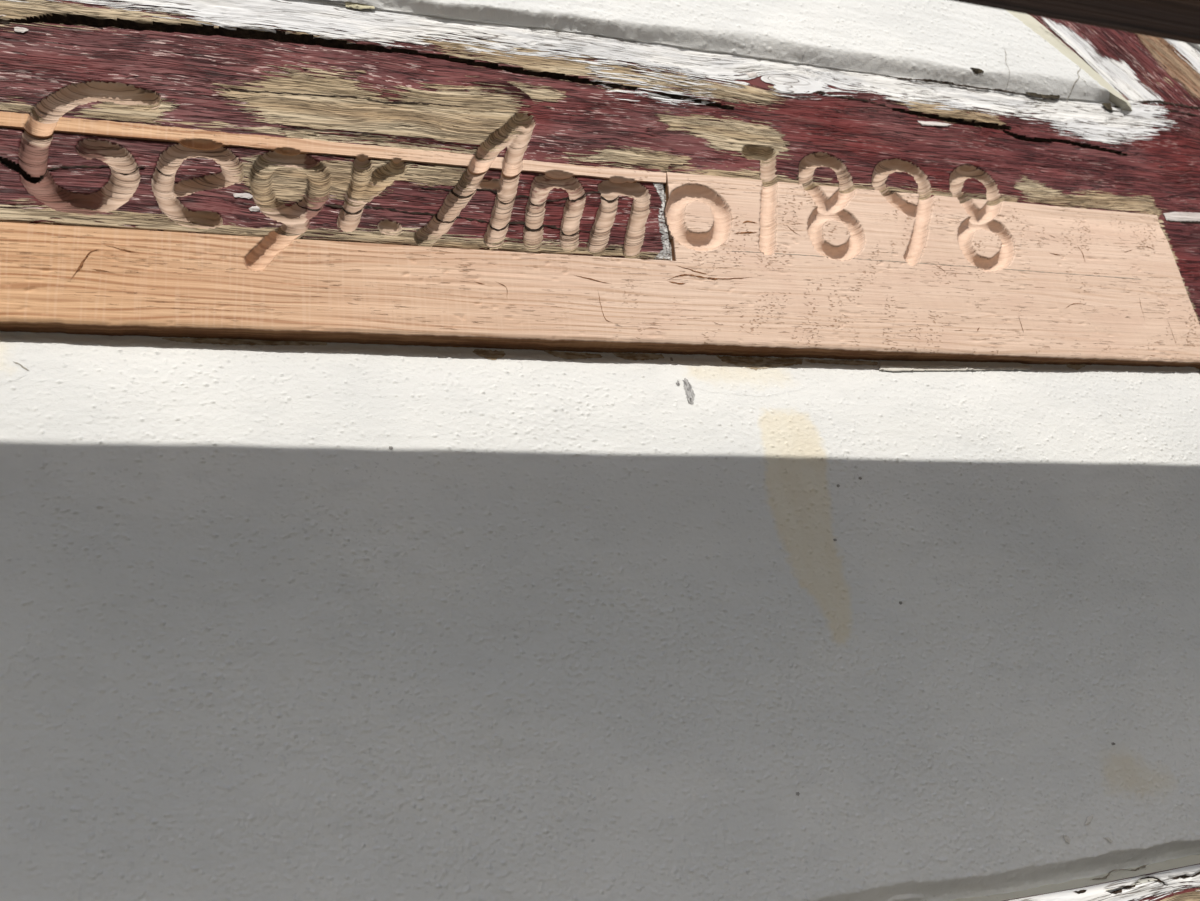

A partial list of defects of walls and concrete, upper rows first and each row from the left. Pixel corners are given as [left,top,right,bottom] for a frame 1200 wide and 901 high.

peeling [0,0,353,47]
crack [0,13,734,109]
peeling [0,34,1200,284]
damp [675,355,858,653]